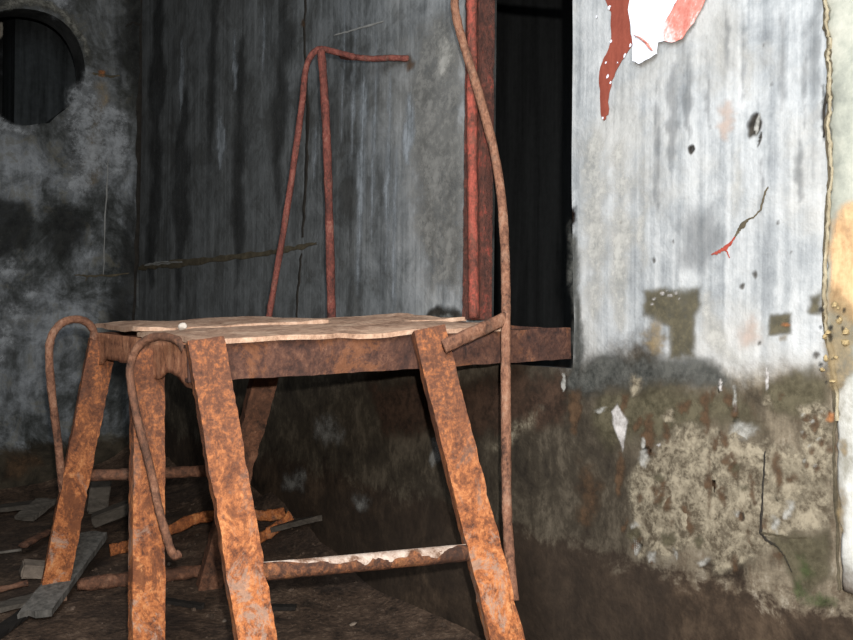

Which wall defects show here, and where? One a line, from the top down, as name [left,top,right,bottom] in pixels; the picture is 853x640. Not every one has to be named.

peeling [599,0,705,120]
crack [711,187,768,258]
peeling [814,202,853,388]
leakage [766,368,826,416]
flaking render [630,404,831,574]
crack [759,451,798,572]
leakage [772,534,830,591]